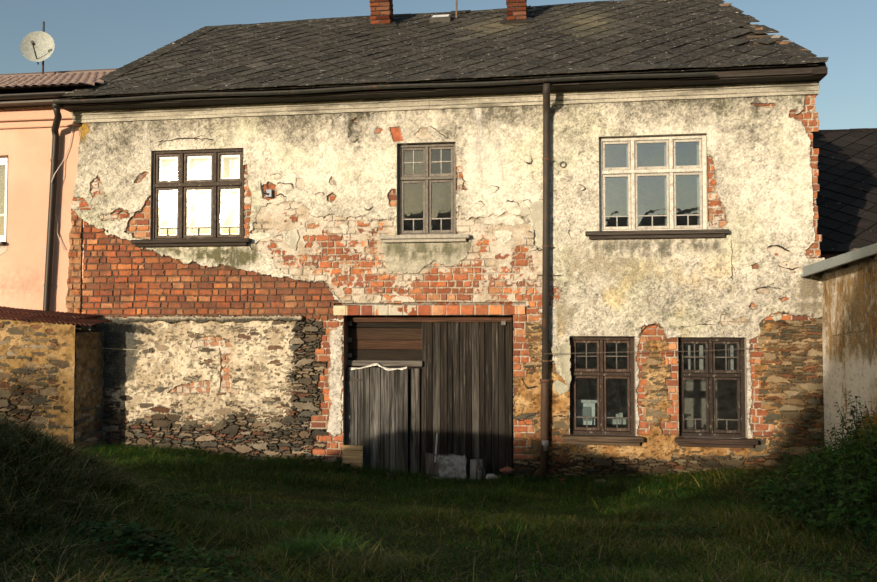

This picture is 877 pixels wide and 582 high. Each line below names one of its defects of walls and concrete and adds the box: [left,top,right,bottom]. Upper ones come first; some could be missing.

flaking render [374,126,404,141]
flaking render [789,95,822,258]
flaking render [64,153,825,481]